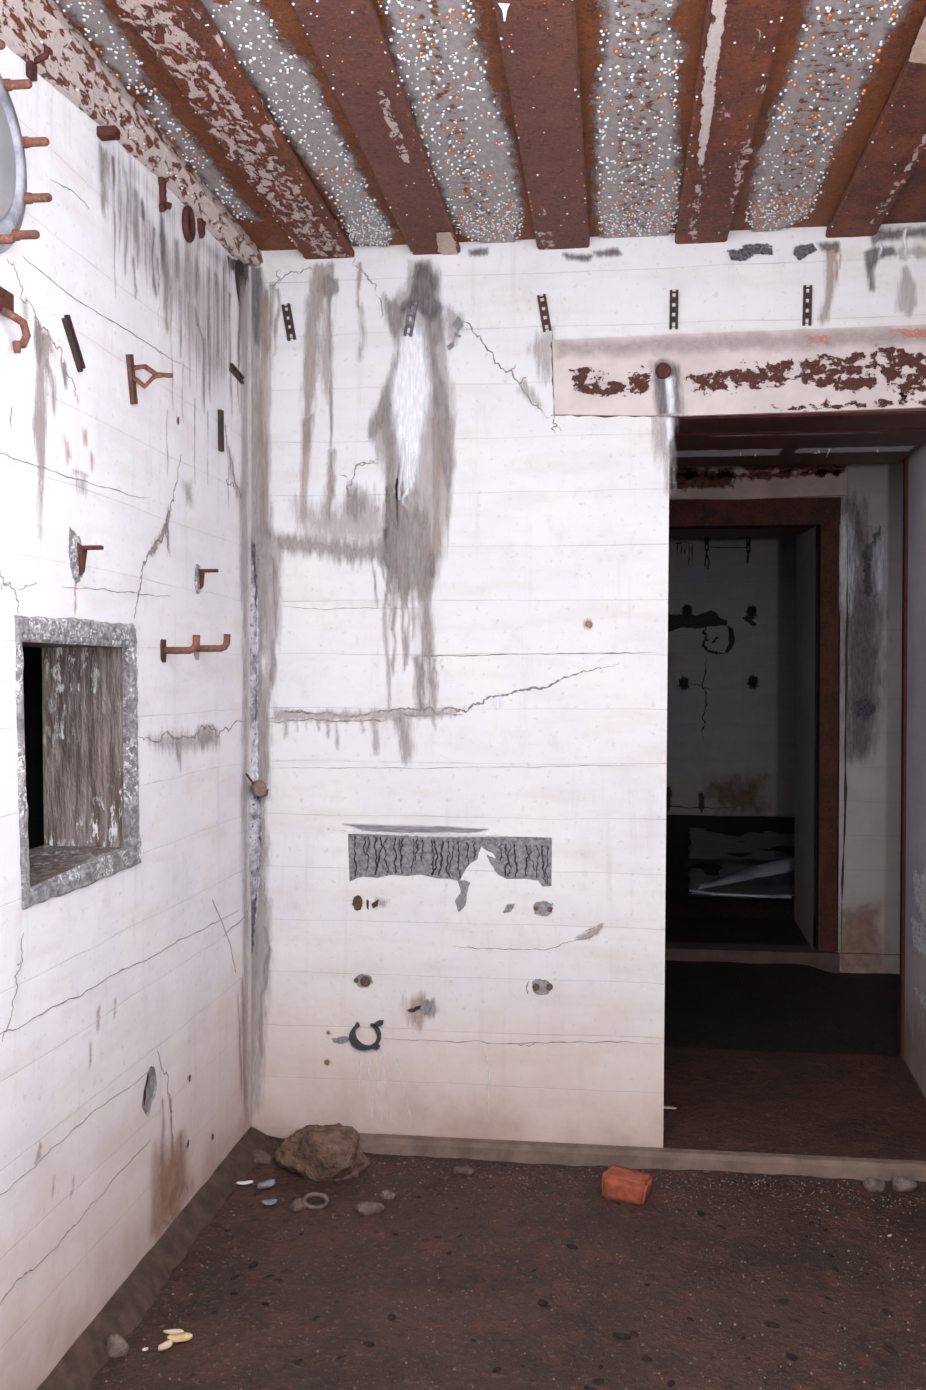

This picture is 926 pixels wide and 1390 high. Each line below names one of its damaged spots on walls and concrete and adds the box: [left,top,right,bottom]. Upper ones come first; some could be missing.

rust [608,0,663,229]
rust [182,205,196,243]
water stain [866,228,926,313]
water stain [25,306,55,501]
rust [569,365,652,397]
rust [686,345,926,413]
crack [0,453,191,618]
water stain [101,152,453,1098]
crack [138,651,652,770]
flaking render [348,834,552,912]
crack [0,899,245,1042]
spalling [142,1066,157,1117]